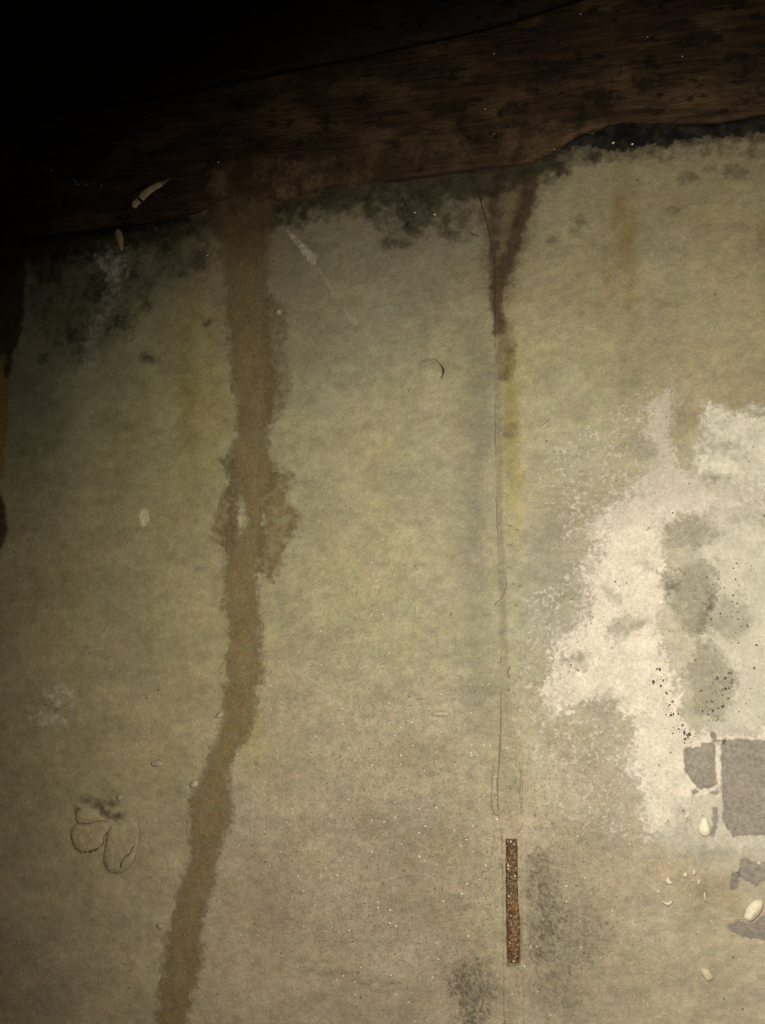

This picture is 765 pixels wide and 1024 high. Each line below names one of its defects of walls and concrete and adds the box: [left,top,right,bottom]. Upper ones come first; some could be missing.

crack [470,193,496,337]
leakage [0,91,613,1024]
crack [495,497,522,606]
crack [491,658,522,816]
peeling [517,387,765,889]
mould [647,661,699,753]
mould [700,668,747,722]